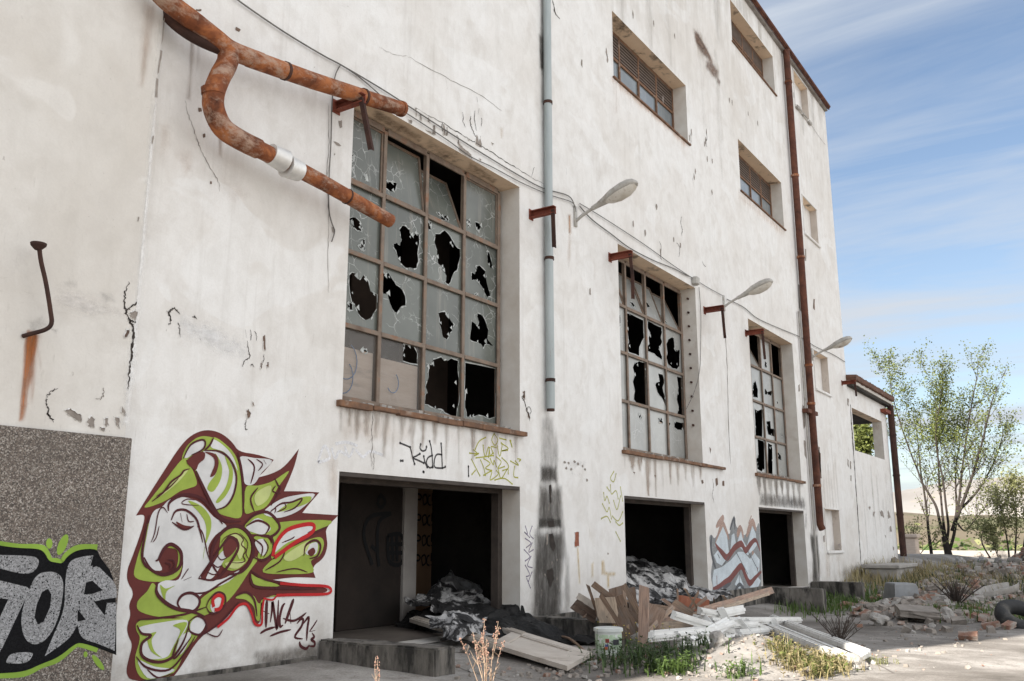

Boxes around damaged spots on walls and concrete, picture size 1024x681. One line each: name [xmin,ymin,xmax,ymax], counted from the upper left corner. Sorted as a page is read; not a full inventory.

corrosion [20,335,36,419]
peeling [64,406,126,432]
crack [100,283,137,400]
damp [535,469,563,616]